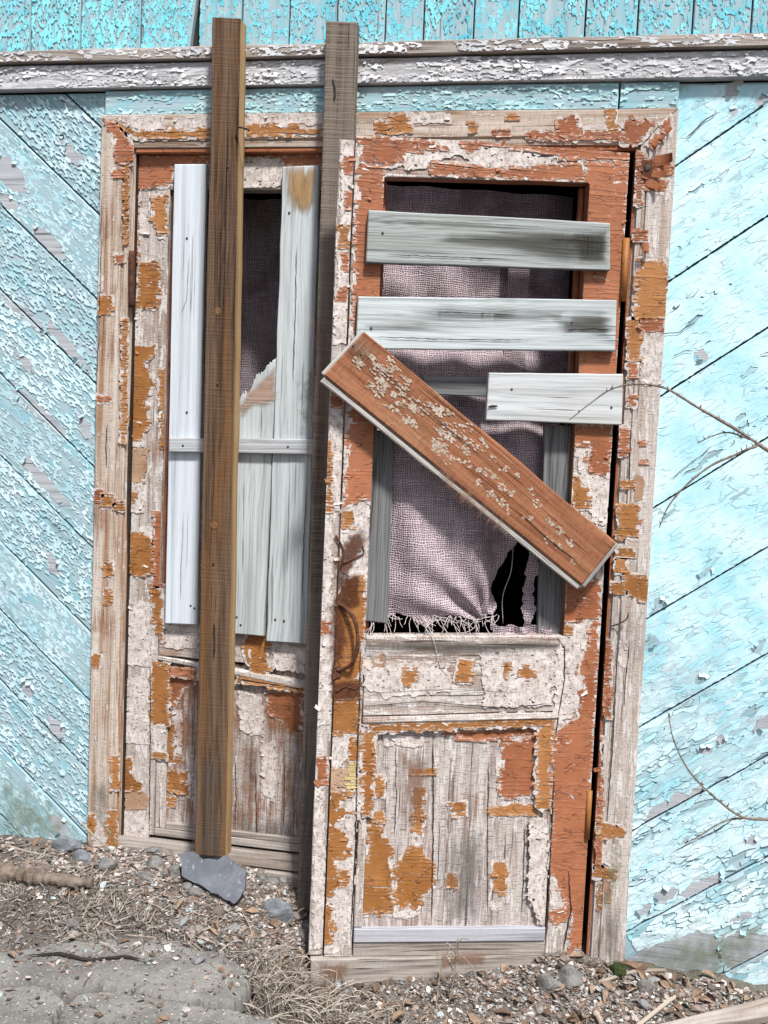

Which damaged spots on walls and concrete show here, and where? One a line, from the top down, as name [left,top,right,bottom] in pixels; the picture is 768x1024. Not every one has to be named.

peeling [0,153,28,210]
peeling [31,223,68,263]
peeling [14,350,37,375]
peeling [11,385,67,437]
peeling [0,293,90,371]
peeling [94,116,211,644]
peeling [324,391,374,530]
peeling [333,109,677,564]
corrosion [330,533,366,666]
peeling [0,424,768,1024]